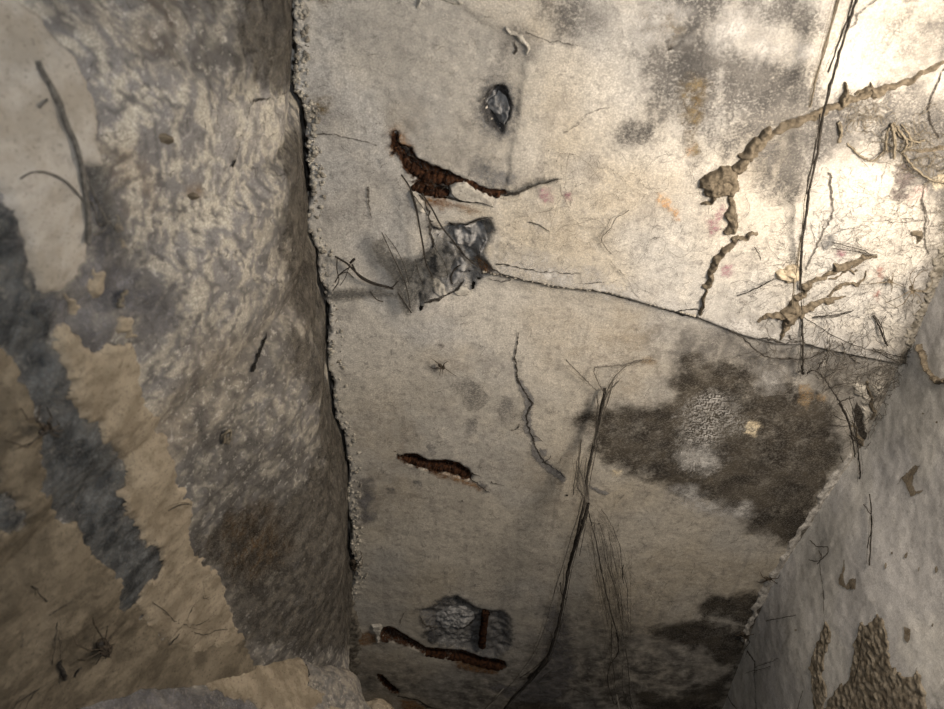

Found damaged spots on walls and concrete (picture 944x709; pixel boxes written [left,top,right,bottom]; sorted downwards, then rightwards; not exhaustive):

leakage [618,121,652,143]
leakage [638,0,944,209]
crack [927,69,944,138]
spalling [390,130,560,311]
crack [806,172,834,270]
crack [488,263,710,323]
crack [511,333,609,495]
leakage [574,318,840,545]
spalling [366,674,435,709]
spalling [349,594,514,676]
leakage [635,591,762,709]
peeling [808,614,927,709]